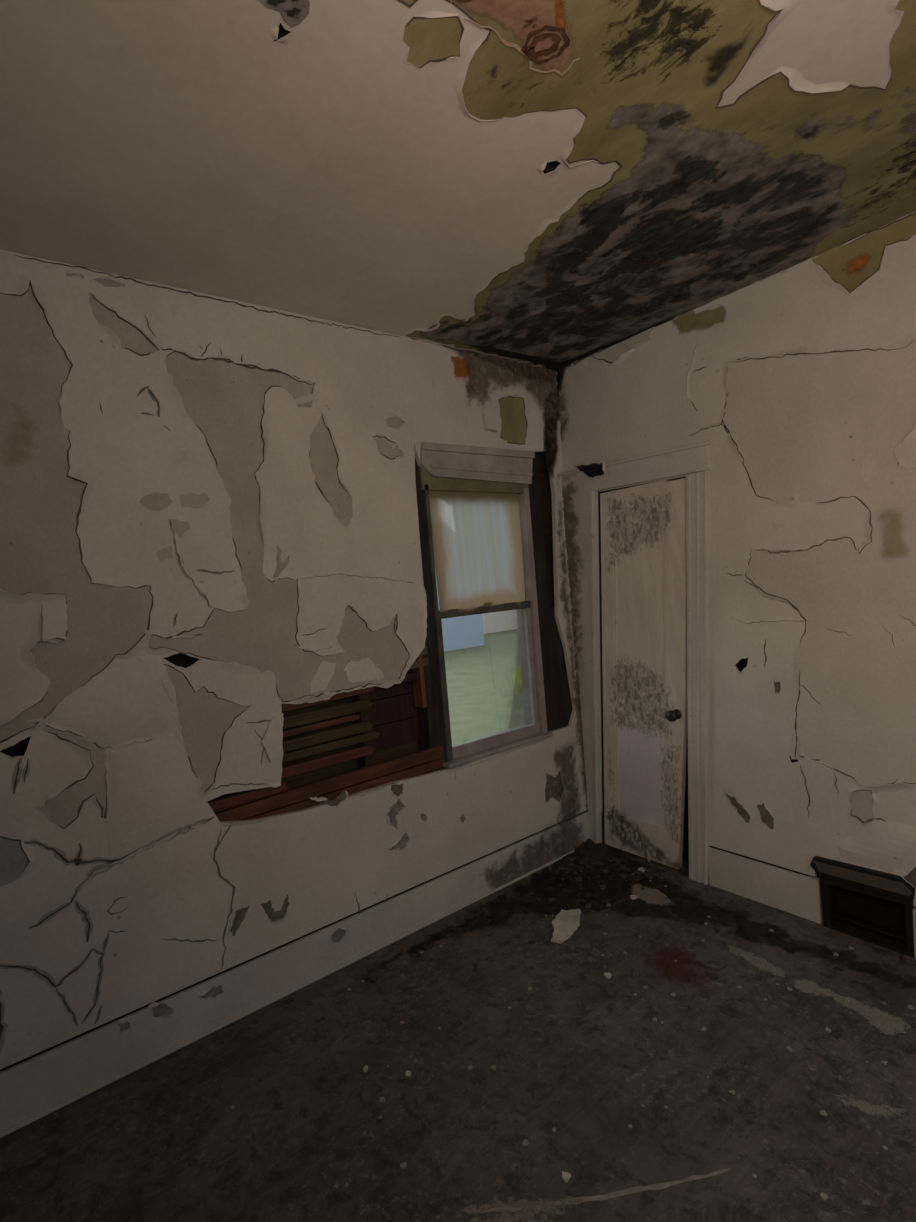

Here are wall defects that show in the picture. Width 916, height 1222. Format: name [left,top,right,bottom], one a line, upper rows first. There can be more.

peeling [259,0,310,45]
corrosion [450,0,580,76]
peeling [397,0,916,372]
damp [411,90,916,475]
damp [603,0,743,85]
crack [0,720,271,1055]
peeling [0,273,427,829]
damp [486,485,587,889]
damp [608,809,682,872]
crack [726,543,852,705]
crack [791,756,839,817]
peeling [722,332,916,830]